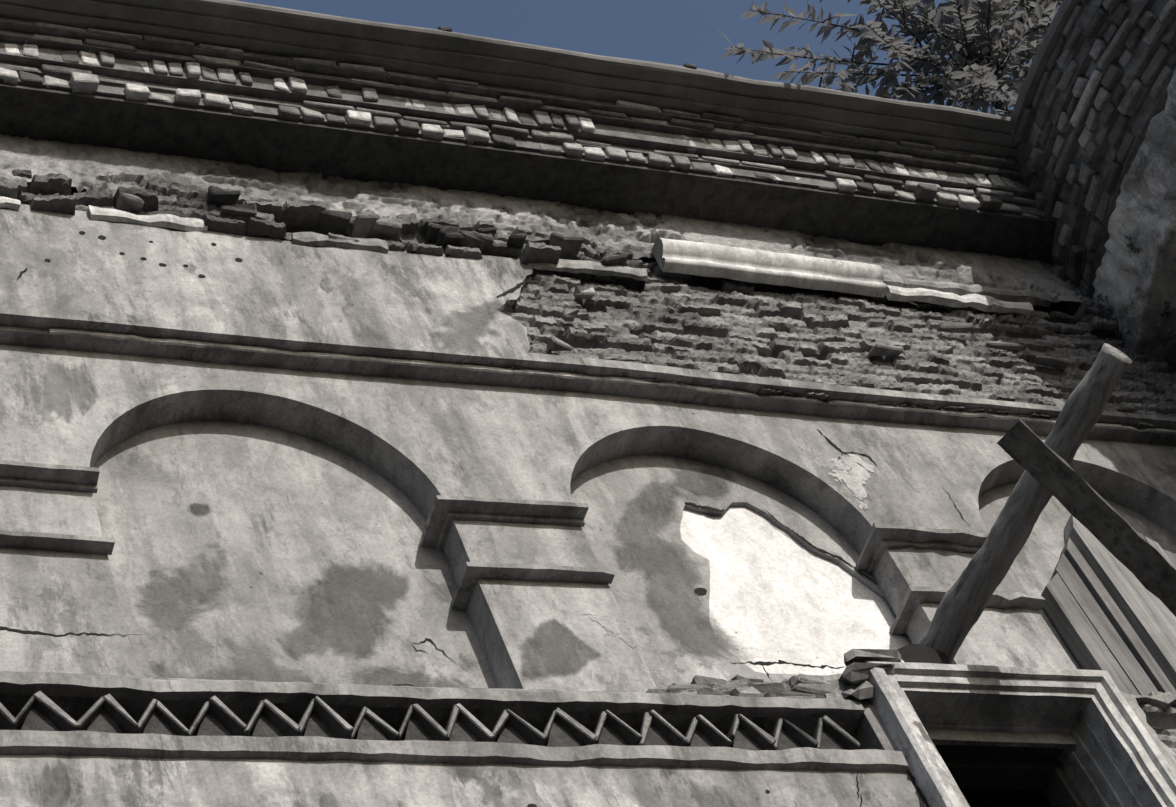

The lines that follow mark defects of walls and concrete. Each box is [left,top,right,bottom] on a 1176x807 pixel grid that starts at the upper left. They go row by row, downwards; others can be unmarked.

flaking render [498,268,1176,430]
crack [817,429,876,465]
damp [617,469,738,656]
crack [0,626,141,636]
damp [140,564,223,628]
damp [155,566,407,683]
damp [351,667,468,688]
crack [730,659,846,681]
flaking render [1127,691,1176,754]